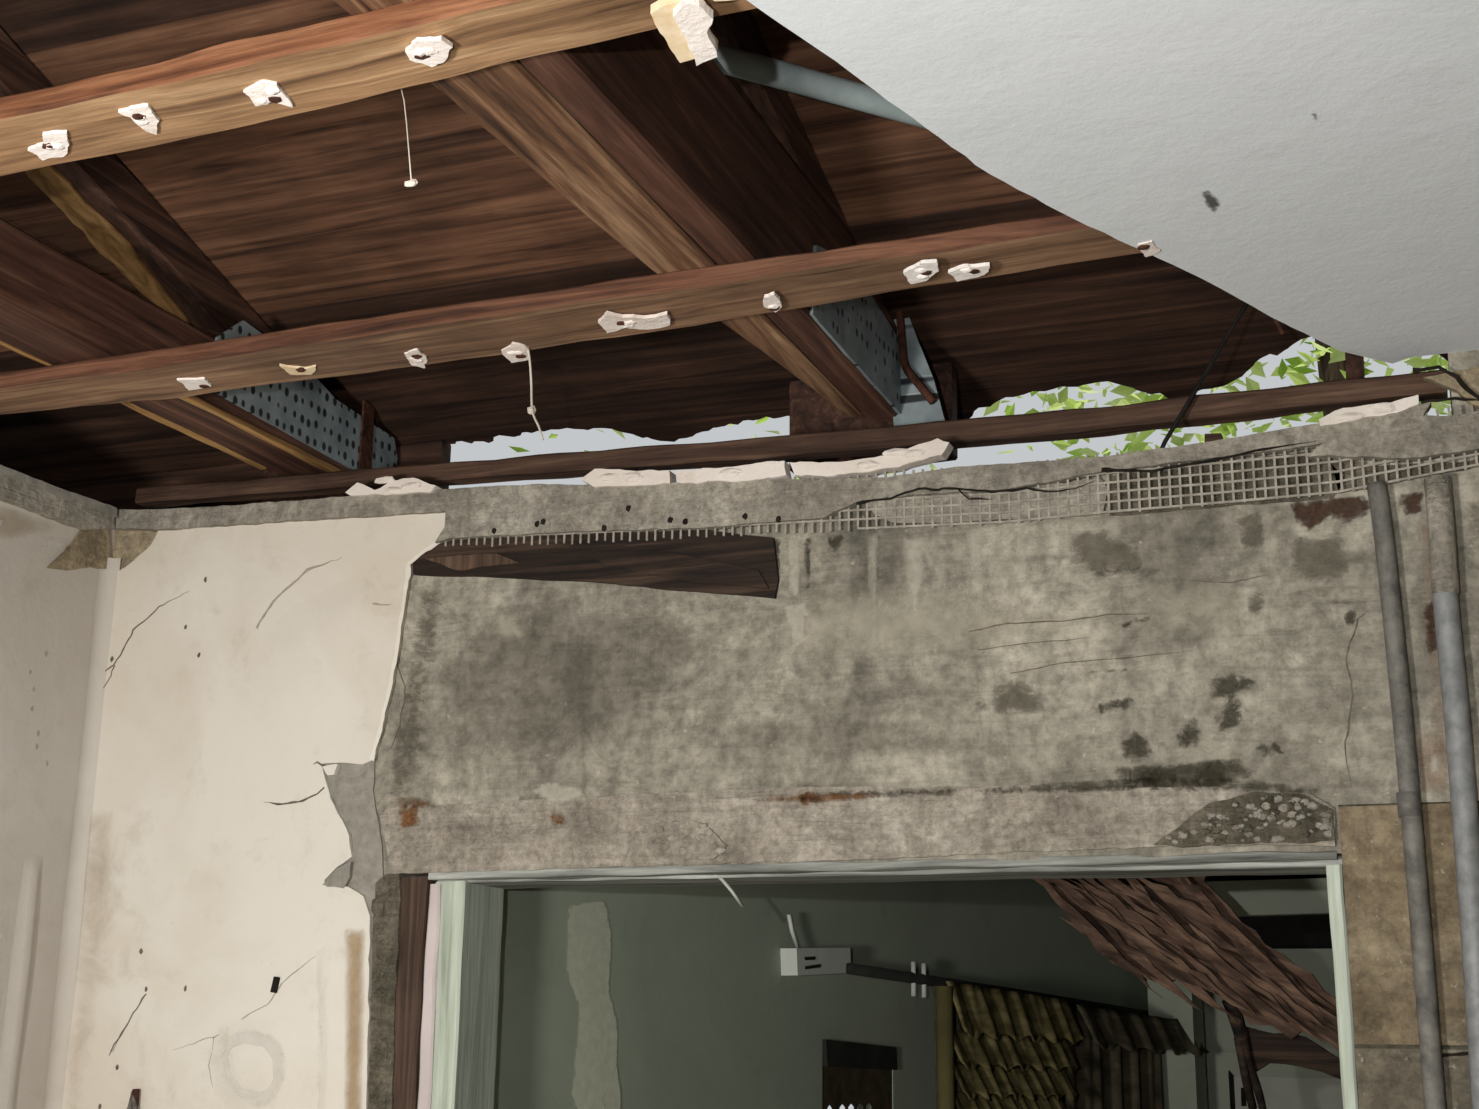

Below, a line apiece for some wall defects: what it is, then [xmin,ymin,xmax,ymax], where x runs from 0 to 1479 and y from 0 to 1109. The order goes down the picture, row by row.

crack [1413,365,1479,404]
rust [1292,497,1370,528]
rust [1402,493,1422,514]
spalling [47,529,158,571]
crack [103,591,189,688]
mould [1214,675,1253,728]
spalling [267,542,439,917]
mould [992,732,1302,793]
rust [772,792,873,806]
mould [817,789,951,797]
spalling [1154,792,1336,848]
crack [109,994,146,1055]